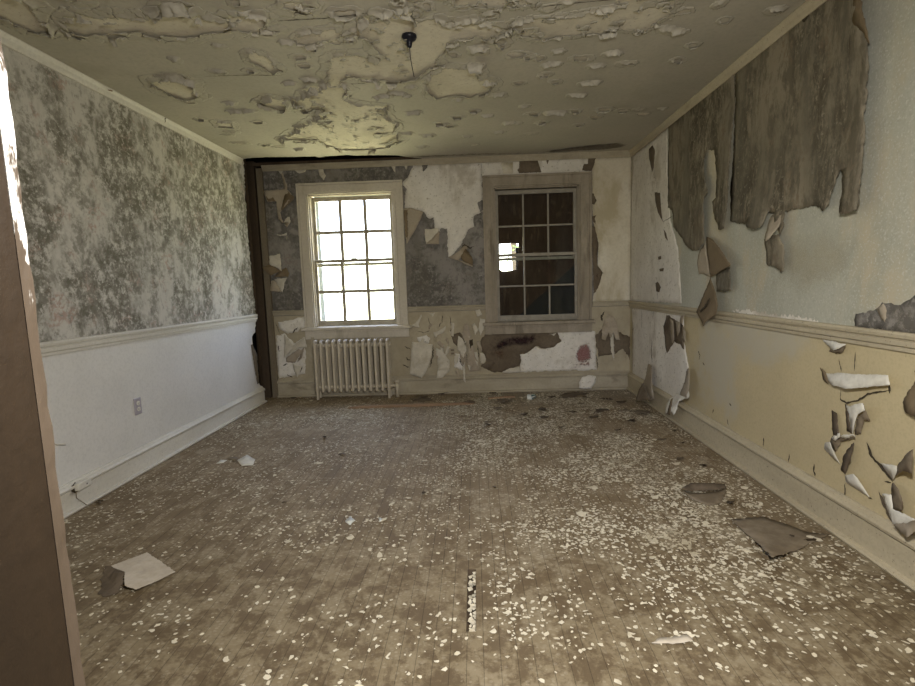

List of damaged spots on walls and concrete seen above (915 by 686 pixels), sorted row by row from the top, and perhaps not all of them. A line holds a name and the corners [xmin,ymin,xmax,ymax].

flaking render [276,317,307,378]
flaking render [391,130,689,396]